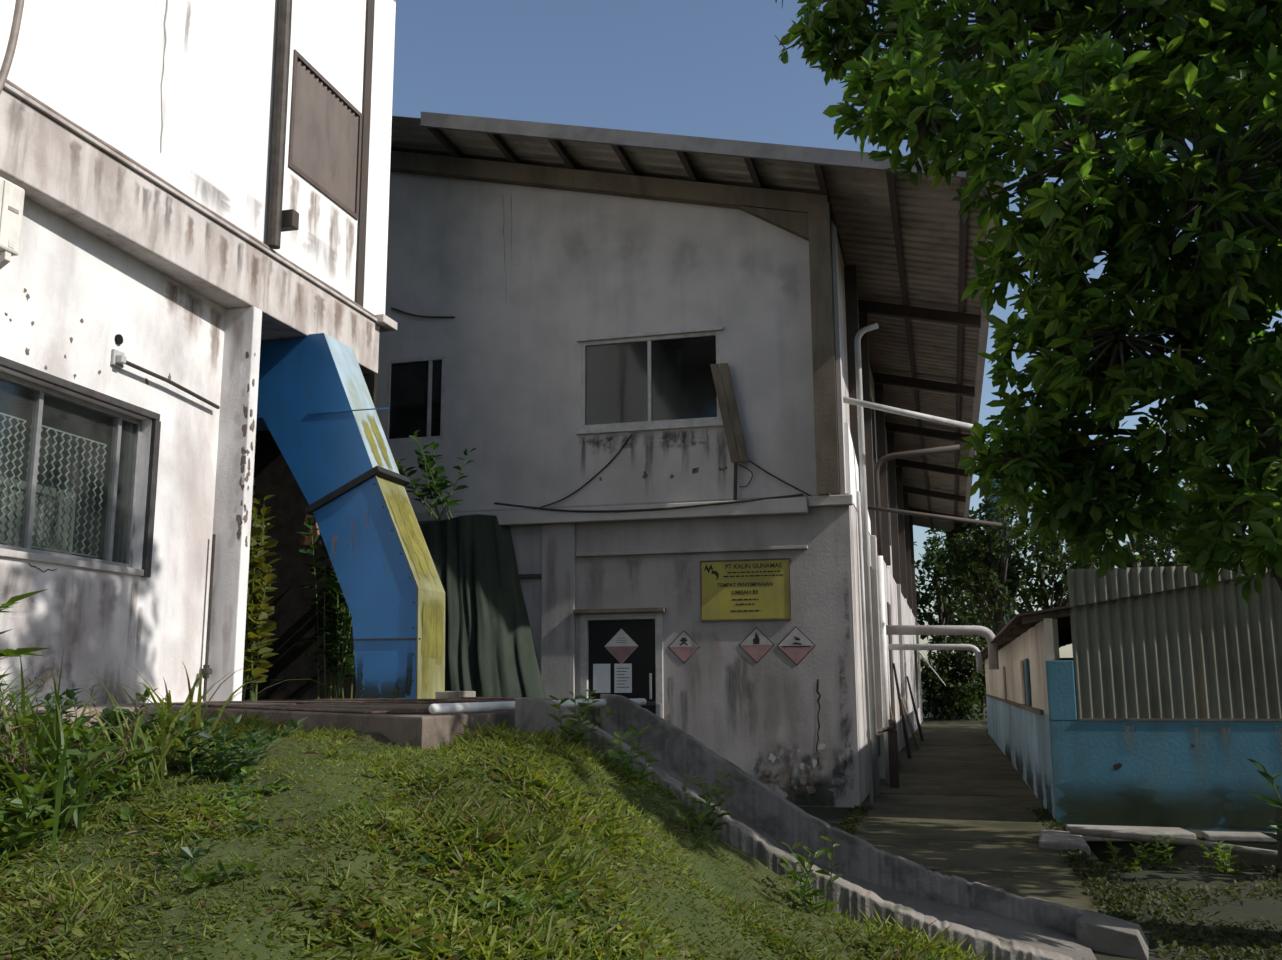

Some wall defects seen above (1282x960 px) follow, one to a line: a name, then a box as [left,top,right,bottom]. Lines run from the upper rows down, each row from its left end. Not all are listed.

leakage [160,0,168,153]
leakage [223,240,258,281]
spalling [236,379,255,547]
leakage [780,719,853,807]
leakage [1005,748,1276,830]